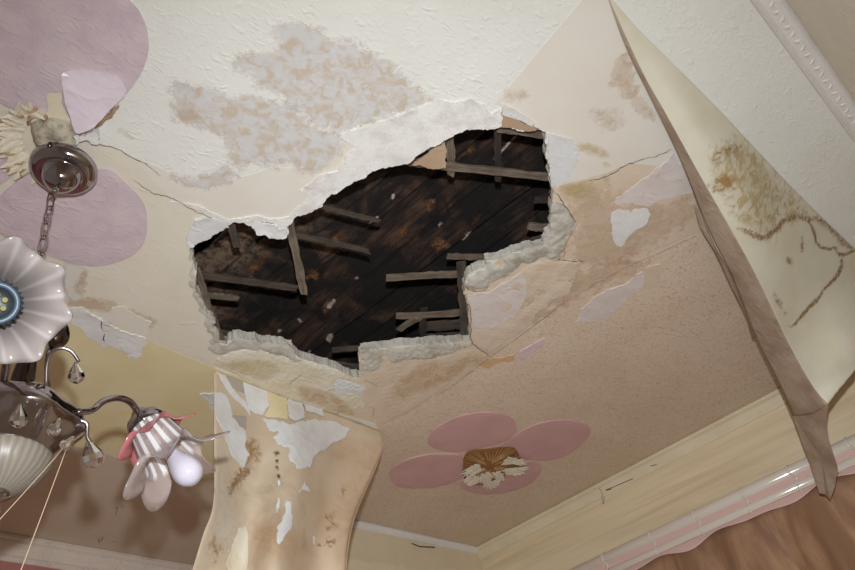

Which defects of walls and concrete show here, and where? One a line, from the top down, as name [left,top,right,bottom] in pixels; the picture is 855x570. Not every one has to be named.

peeling [0,107,48,127]
peeling [95,105,119,129]
leakage [173,24,430,189]
crack [98,144,227,248]
crack [553,190,582,262]
peeling [610,153,693,247]
leakage [713,147,854,325]
peeling [69,306,152,360]
peeling [170,98,583,470]
peeling [576,272,644,322]
peeling [225,525,249,570]
peeling [276,497,293,544]